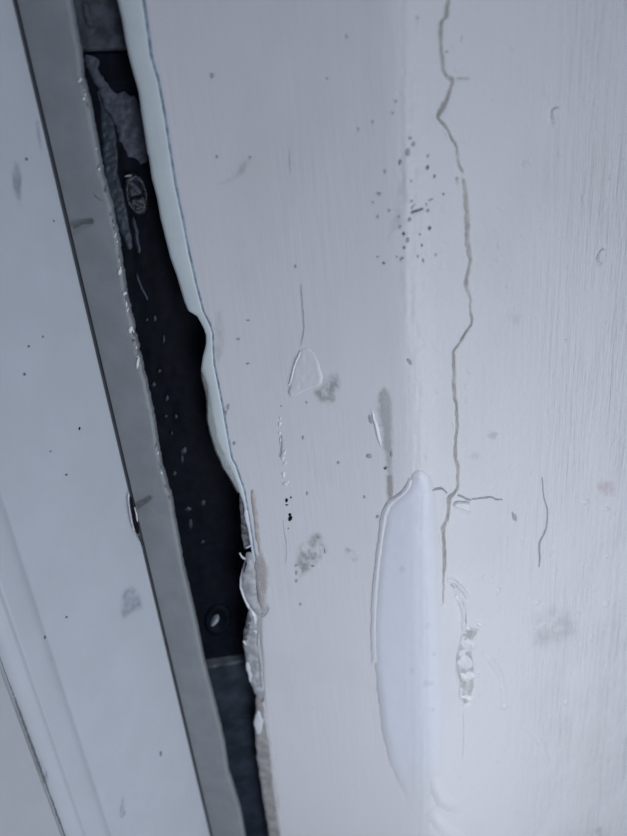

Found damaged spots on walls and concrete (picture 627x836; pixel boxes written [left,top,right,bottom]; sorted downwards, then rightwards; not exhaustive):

crack [432,0,503,604]
crack [538,477,548,567]
spalling [447,578,483,707]